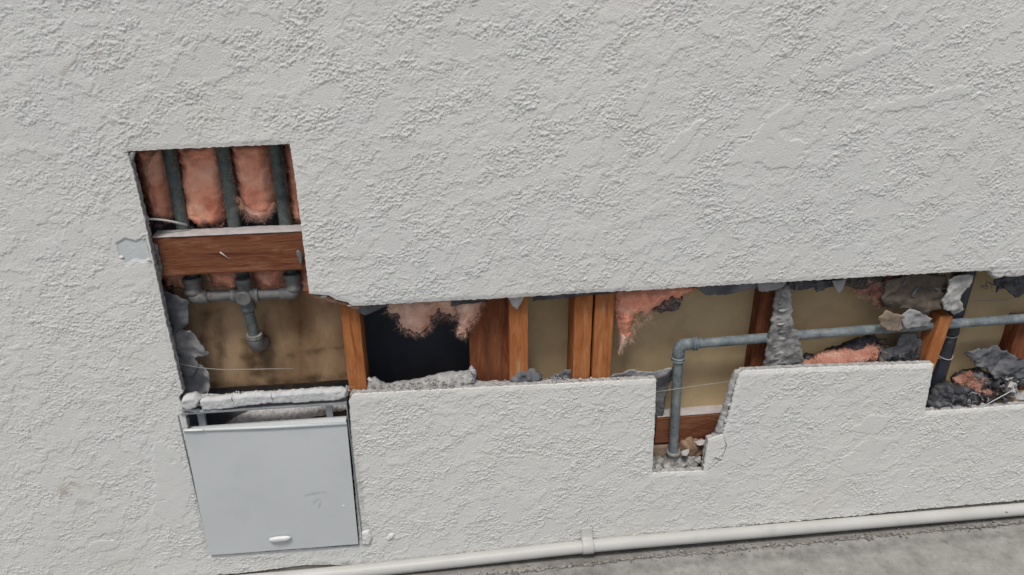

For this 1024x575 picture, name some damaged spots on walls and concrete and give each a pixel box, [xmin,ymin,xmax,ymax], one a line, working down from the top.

spalling [116,151,190,429]
spalling [507,297,524,310]
spalling [987,268,1024,279]
spalling [349,365,656,400]
spalling [652,360,933,474]
spalling [925,400,1024,412]